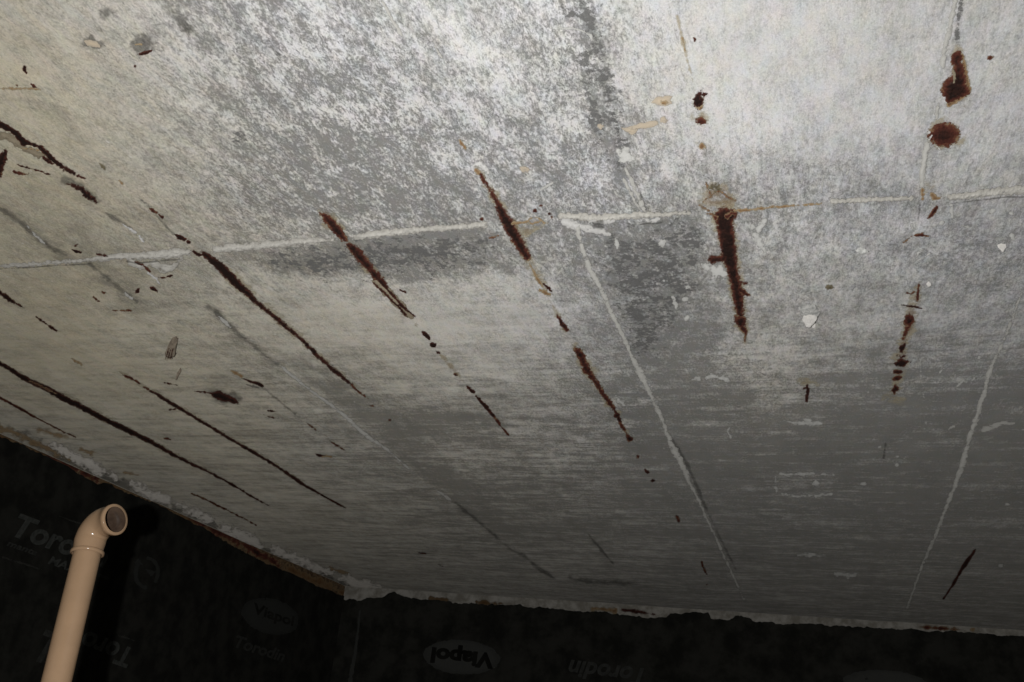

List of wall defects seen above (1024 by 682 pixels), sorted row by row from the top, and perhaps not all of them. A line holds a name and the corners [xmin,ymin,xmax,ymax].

corrosion [940,51,971,107]
corrosion [0,149,28,178]
corrosion [319,212,415,319]
corrosion [473,161,553,296]
corrosion [699,182,822,342]
corrosion [921,188,941,219]
corrosion [927,122,961,150]
corrosion [891,284,922,395]
corrosion [466,386,509,436]
corrosion [573,346,633,442]
corrosion [0,426,348,596]